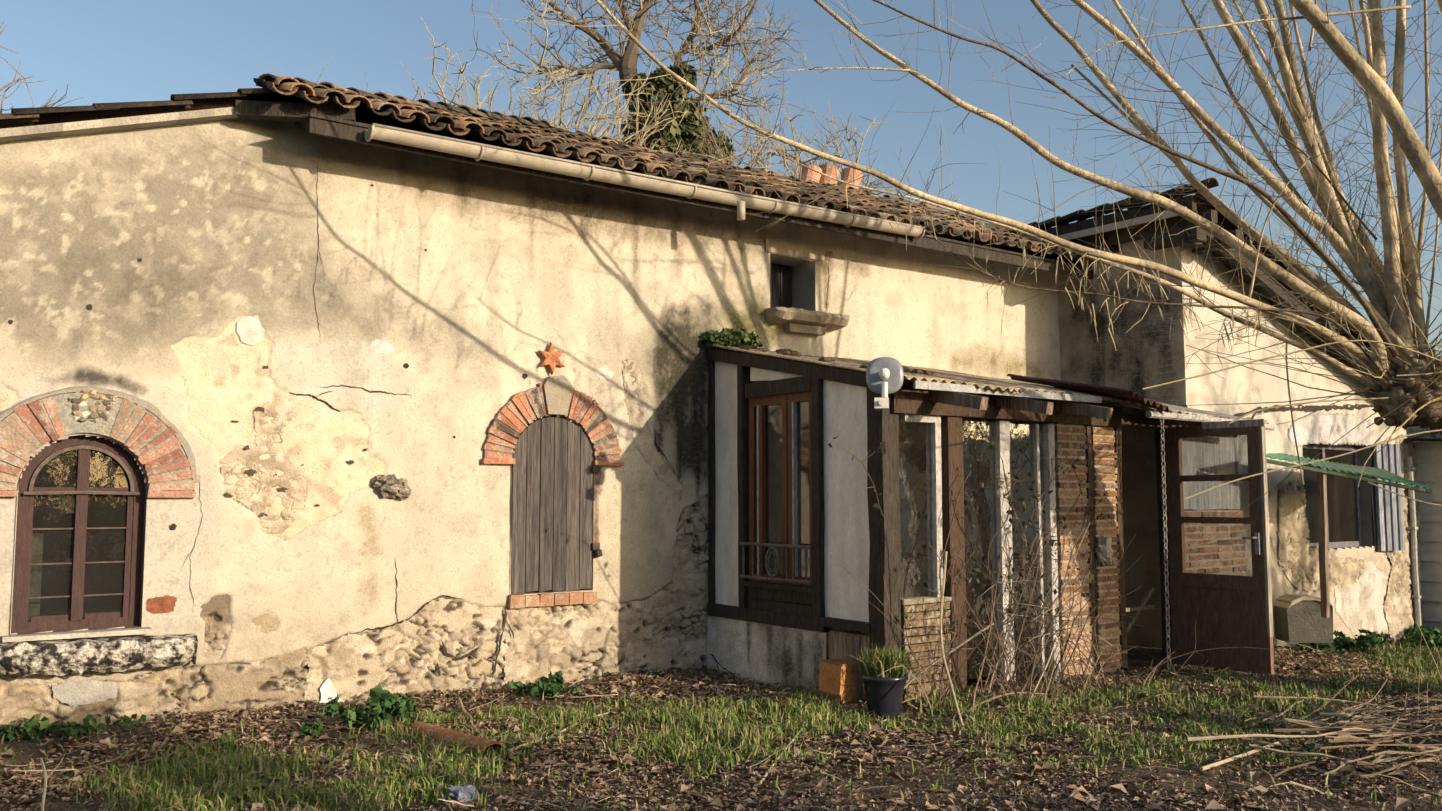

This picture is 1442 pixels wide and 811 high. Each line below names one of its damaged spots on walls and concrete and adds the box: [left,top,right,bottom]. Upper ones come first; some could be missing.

crack [313,169,324,344]
peeling [170,315,387,541]
crack [289,384,408,420]
damp [654,350,705,489]
crack [182,473,203,606]
flaking render [200,594,232,661]
peeling [252,613,280,634]
peeling [1334,561,1397,638]